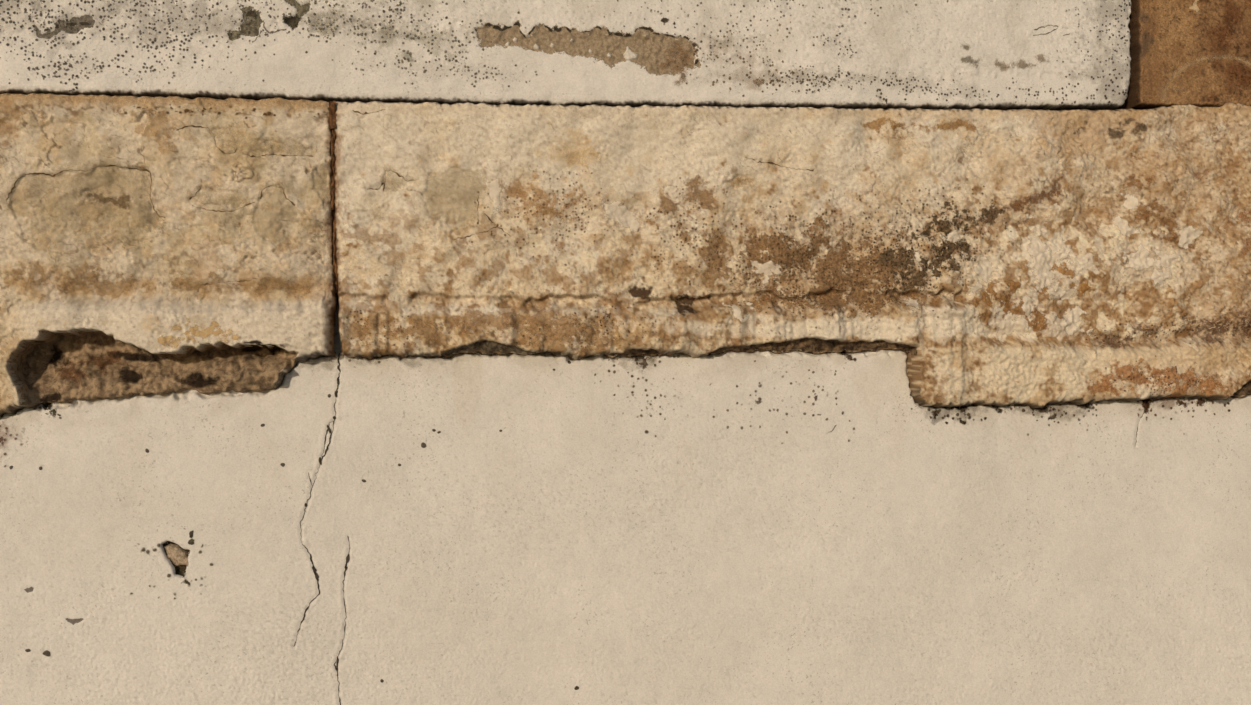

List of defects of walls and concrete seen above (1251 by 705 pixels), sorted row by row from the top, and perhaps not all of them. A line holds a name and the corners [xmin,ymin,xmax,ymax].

flaking render [225,0,311,42]
flaking render [474,18,703,76]
spalling [9,329,298,408]
spalling [1231,380,1251,398]
flaking render [141,528,213,599]
crack [294,353,350,705]